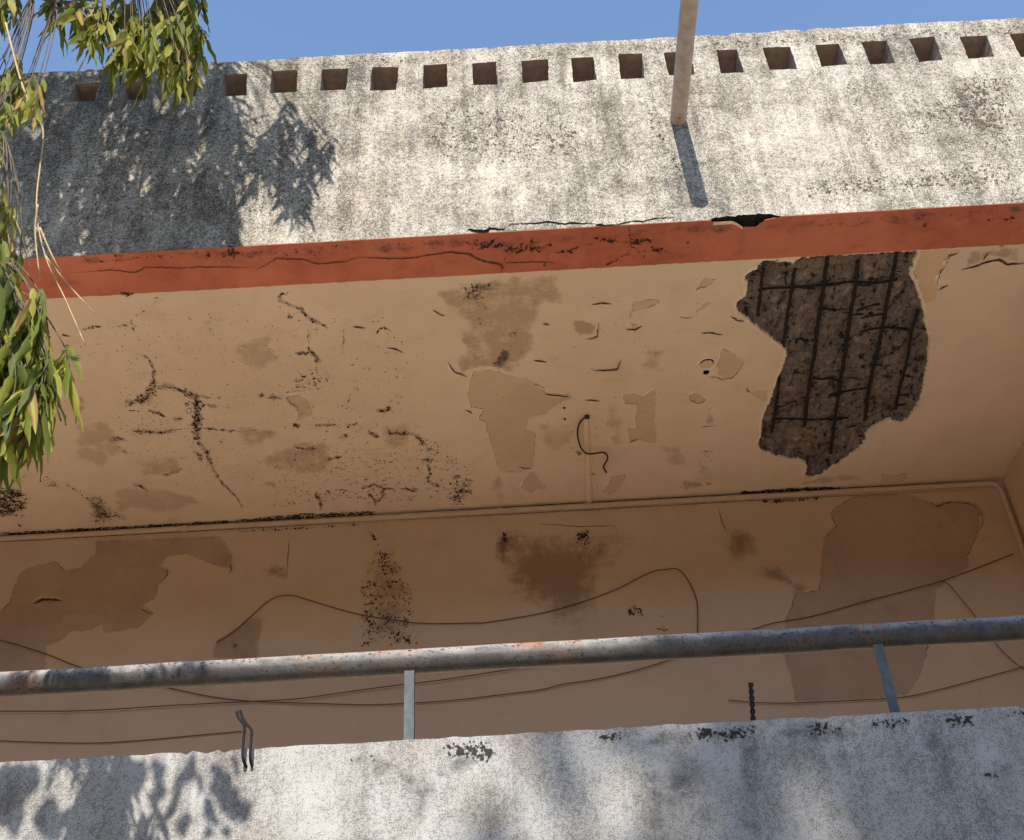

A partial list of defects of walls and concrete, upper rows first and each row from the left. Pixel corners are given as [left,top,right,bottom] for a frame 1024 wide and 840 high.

crack [79,217,677,273]
damp [460,280,498,325]
crack [0,292,993,542]
peeling [447,362,570,495]
peeling [621,387,658,444]
spalling [730,245,1023,480]
peeling [0,536,234,672]
damp [0,419,472,646]
damp [541,524,618,550]
peeling [783,494,985,629]
peeling [783,645,930,703]